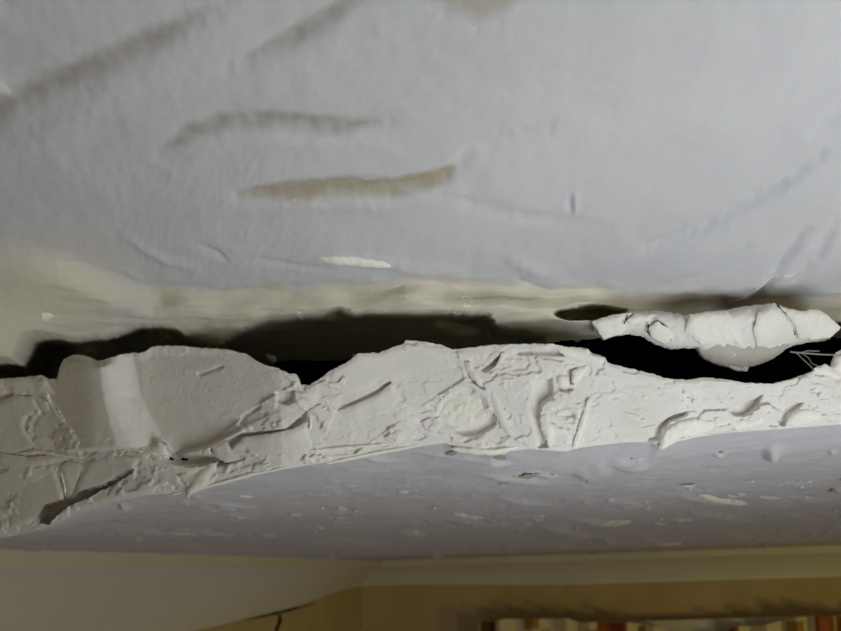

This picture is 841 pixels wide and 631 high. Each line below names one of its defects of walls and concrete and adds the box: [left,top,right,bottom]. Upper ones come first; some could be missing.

spalling [0,340,841,538]